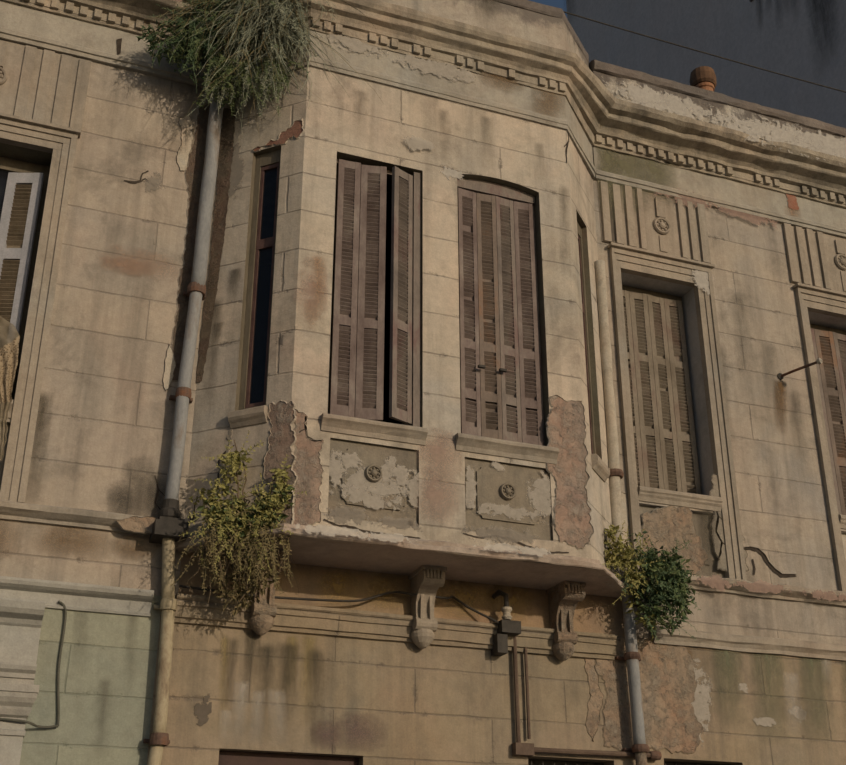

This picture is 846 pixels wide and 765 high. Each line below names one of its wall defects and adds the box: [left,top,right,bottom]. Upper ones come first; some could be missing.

peeling [176,115,194,172]
peeling [228,142,244,197]
flaking render [253,119,305,152]
peeling [606,78,846,164]
peeling [263,400,420,532]
flaking render [465,395,594,550]
spalling [116,516,158,534]
crack [715,512,797,577]
flaking render [194,695,212,726]
flaking render [584,636,633,752]
flaking render [637,636,712,755]